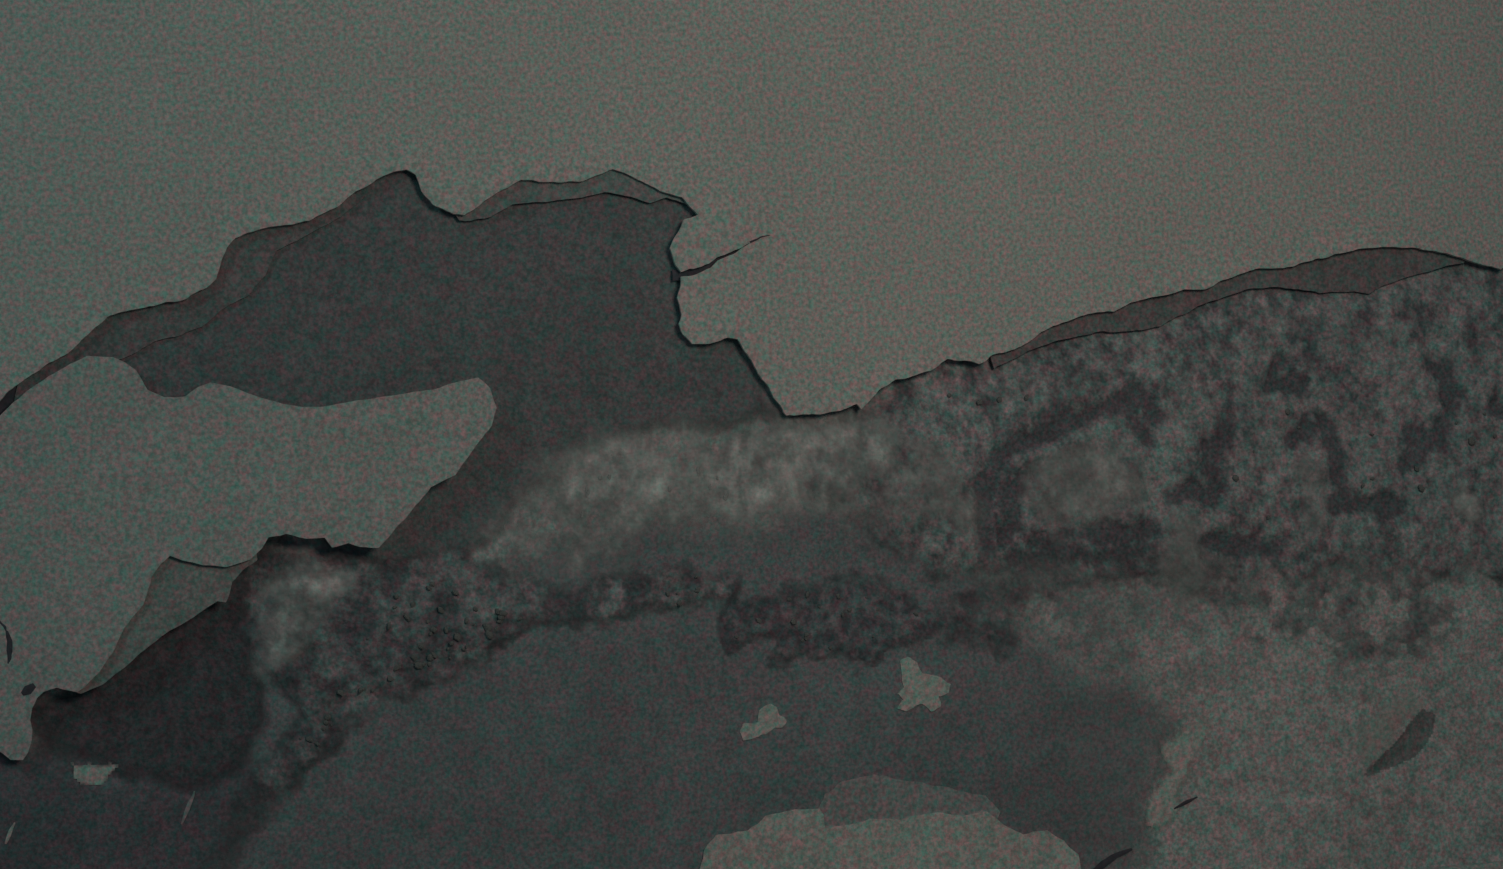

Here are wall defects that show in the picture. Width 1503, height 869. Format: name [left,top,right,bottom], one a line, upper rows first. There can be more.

crack [672,235,770,281]
spalling [0,170,1503,803]
water stain [1453,488,1483,522]